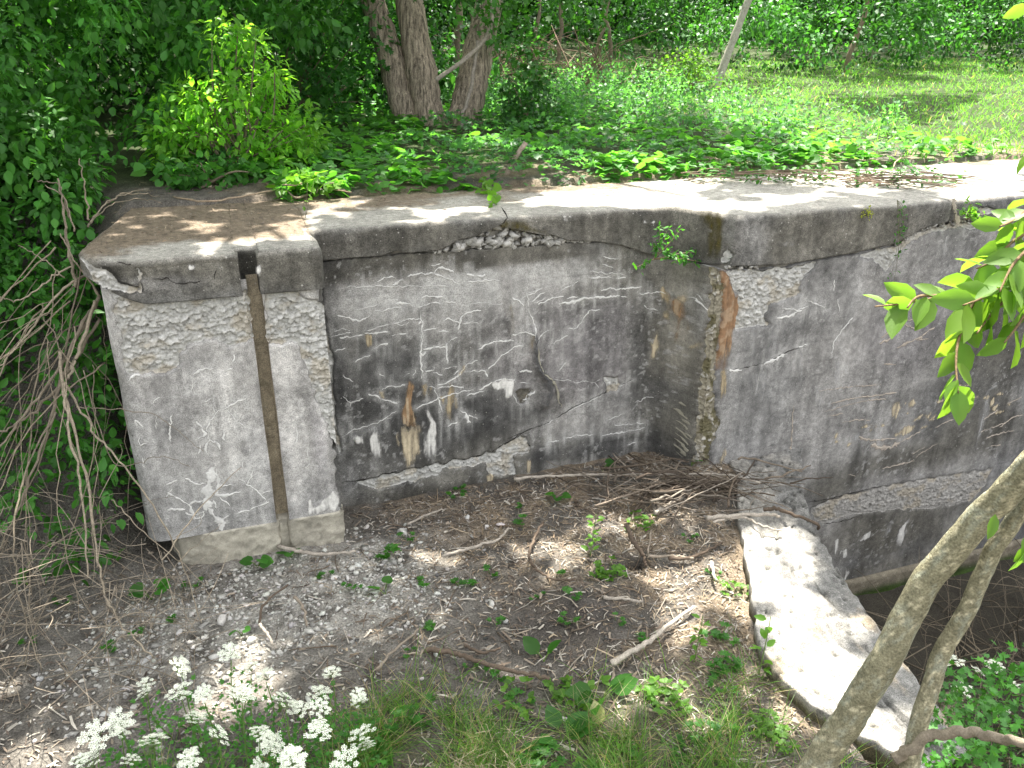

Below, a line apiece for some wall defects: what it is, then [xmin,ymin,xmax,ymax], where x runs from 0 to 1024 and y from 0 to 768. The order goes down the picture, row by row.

spalling [432,225,591,254]
crack [134,355,271,531]
spalling [80,257,342,452]
damp [355,433,380,456]
rust [396,382,419,465]
damp [440,387,478,423]
crack [328,256,665,482]
rust [715,271,739,393]
spalling [673,250,816,465]
spalling [809,468,993,525]